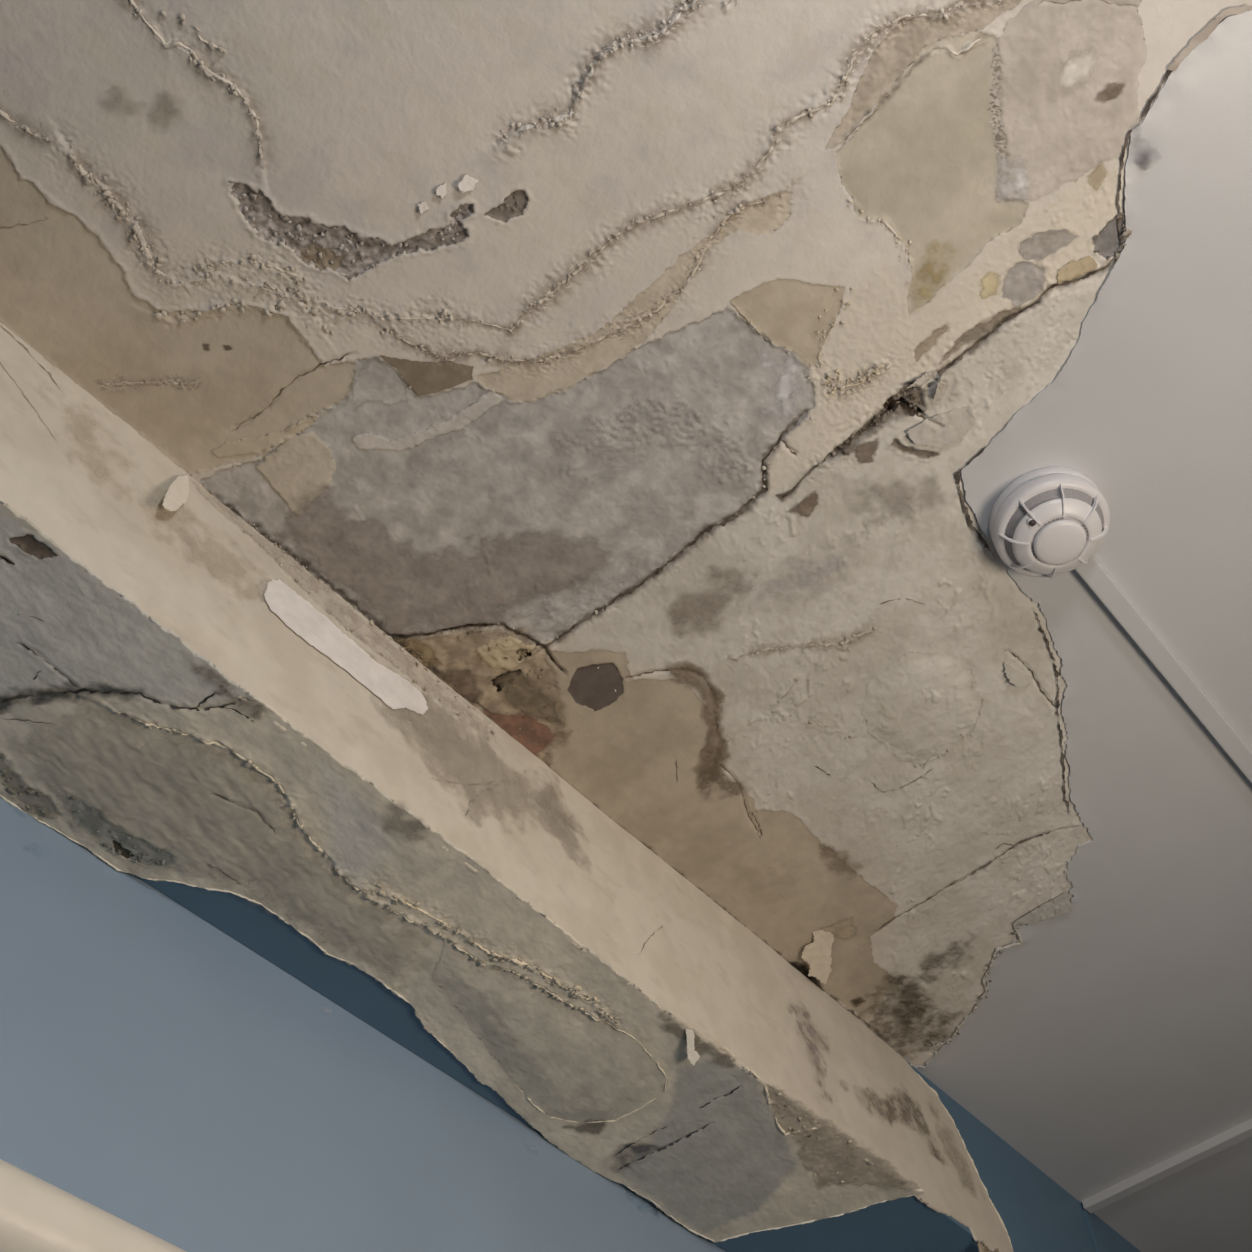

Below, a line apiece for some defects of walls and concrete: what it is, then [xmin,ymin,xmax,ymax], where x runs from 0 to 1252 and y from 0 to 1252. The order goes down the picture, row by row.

crack [397,70,1174,673]
crack [0,614,254,725]
peeling [0,498,924,1243]
damp [852,947,959,1055]
crack [870,609,1077,935]